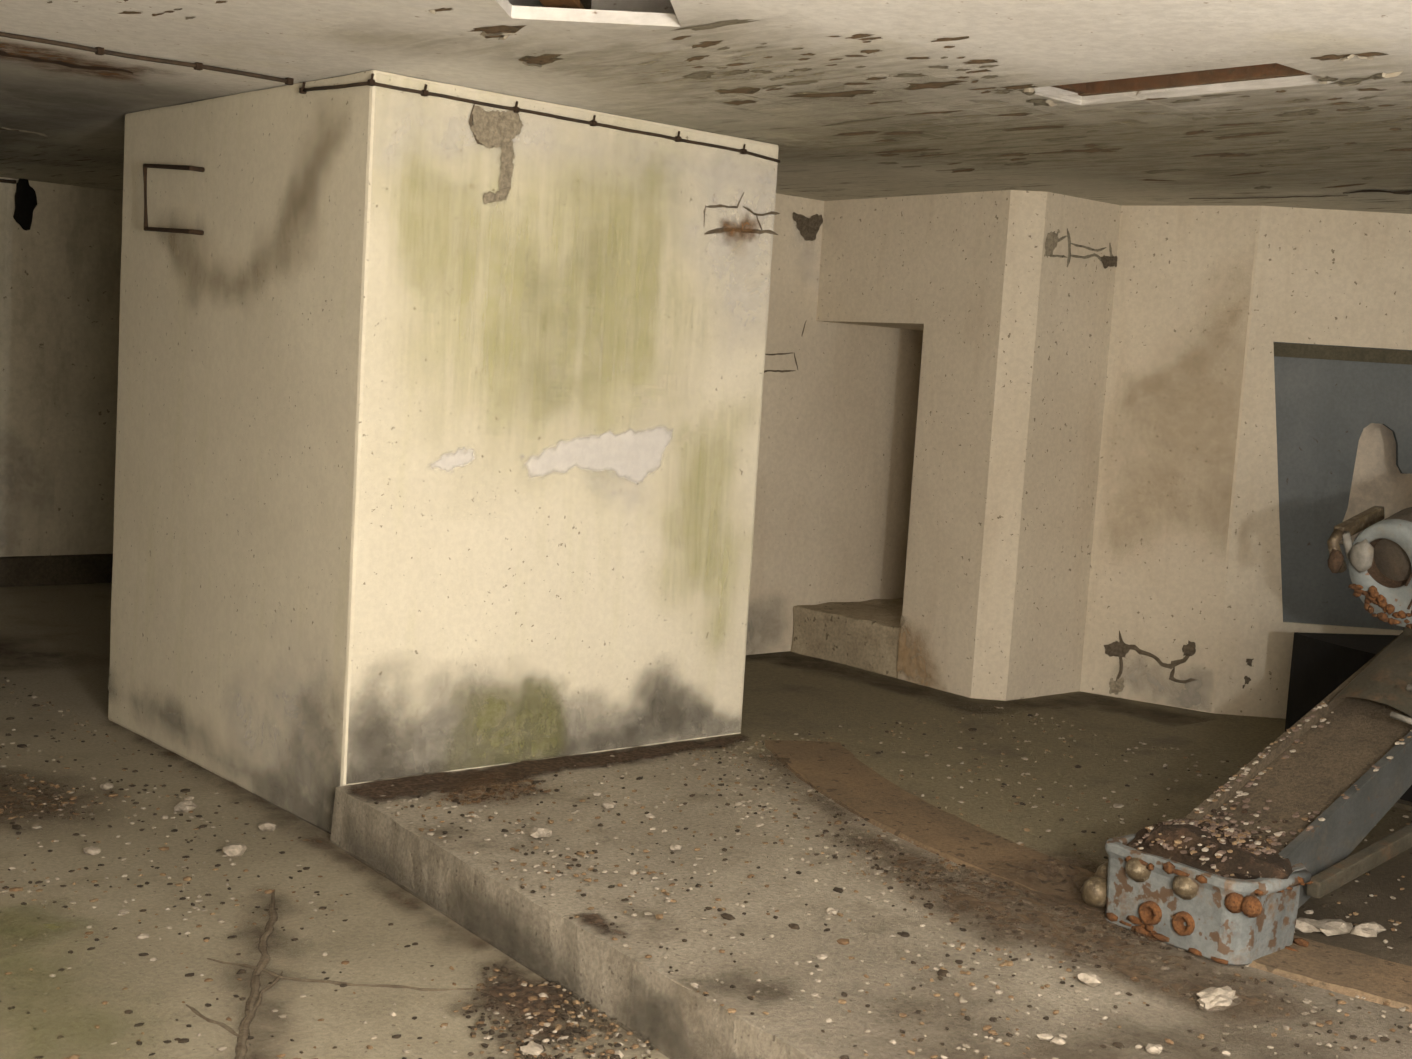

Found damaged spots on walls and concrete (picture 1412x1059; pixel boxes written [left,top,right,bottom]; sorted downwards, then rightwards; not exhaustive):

peeling [119,0,195,20]
peeling [671,19,1126,173]
peeling [1141,52,1412,189]
peeling [526,428,671,482]
leakage [273,678,748,830]
crack [186,889,473,1059]